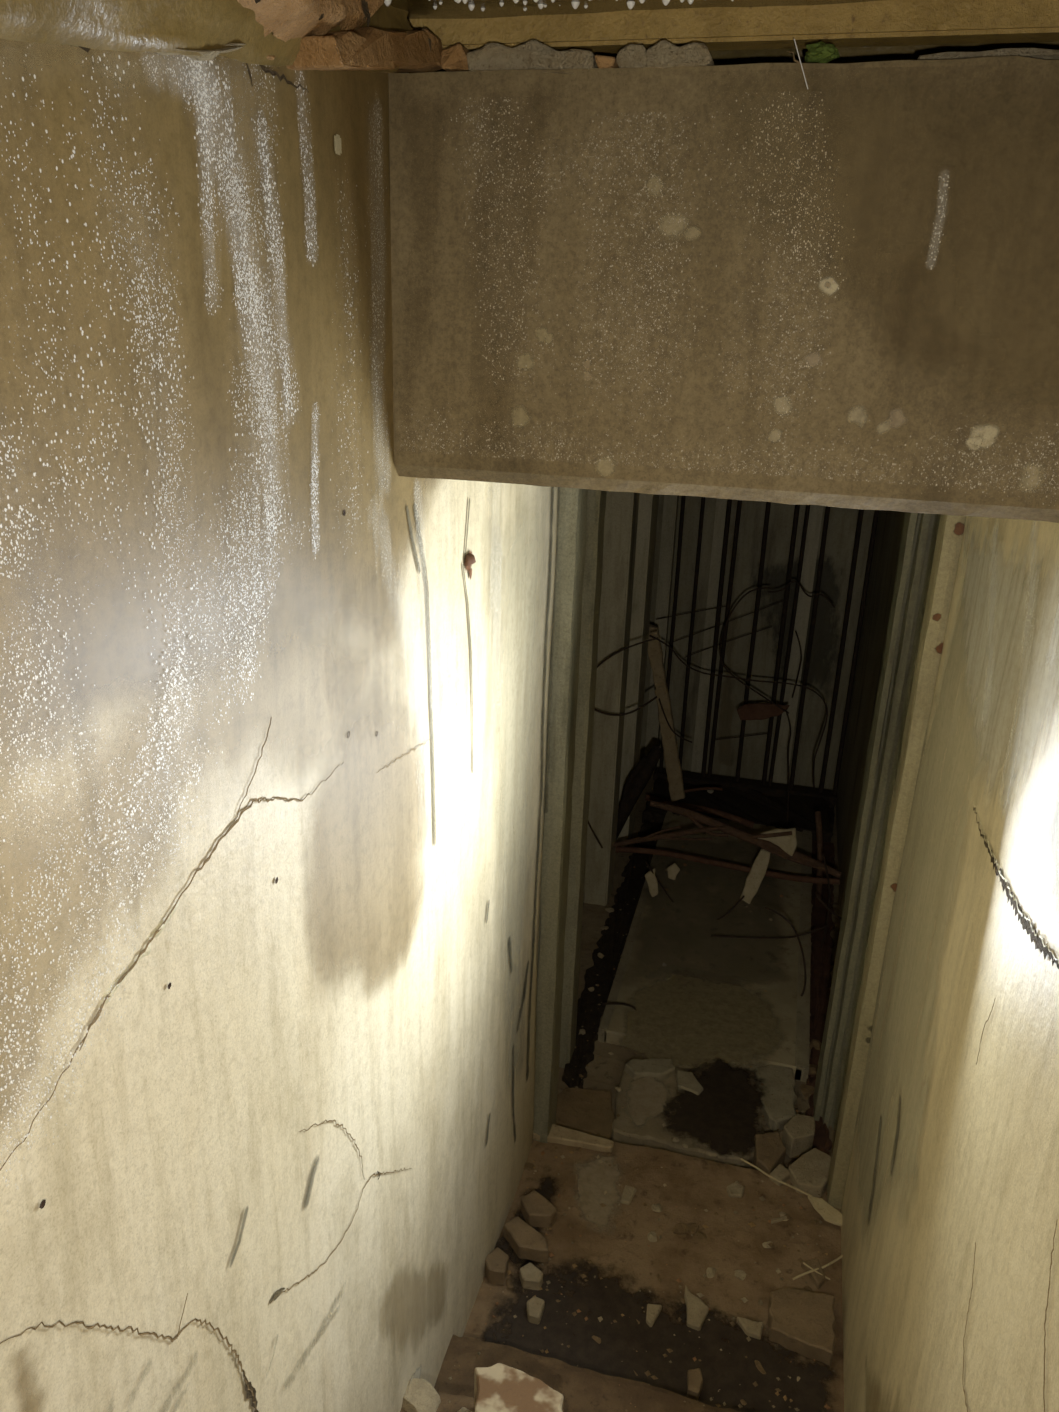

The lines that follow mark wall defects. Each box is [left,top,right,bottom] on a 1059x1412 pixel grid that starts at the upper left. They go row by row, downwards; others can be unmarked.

damp [794,415,1059,506]
damp [0,44,808,1187]
crack [462,499,473,773]
damp [754,558,839,688]
damp [964,519,1059,818]
crack [0,504,436,1171]
crack [973,802,1059,969]
crack [270,1120,412,1304]
crack [0,1293,259,1412]